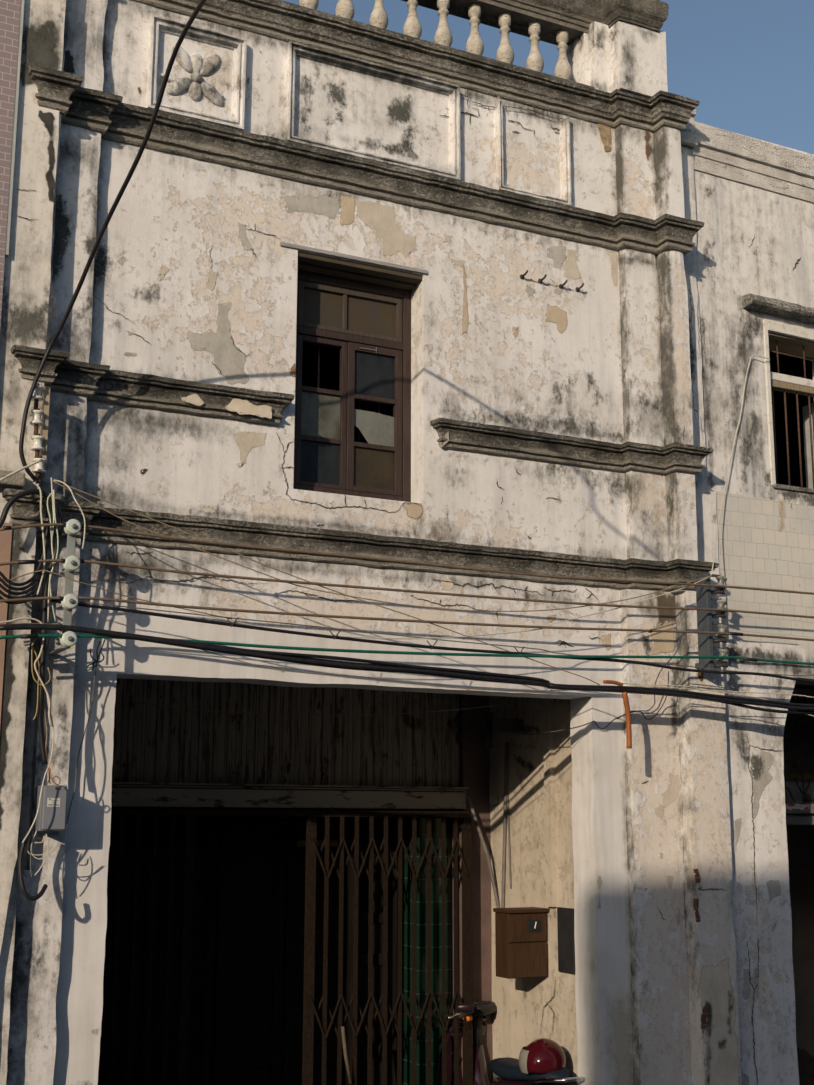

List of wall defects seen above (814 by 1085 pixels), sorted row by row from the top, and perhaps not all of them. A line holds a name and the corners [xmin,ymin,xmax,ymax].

water stain [20,18,75,86]
water stain [327,83,346,125]
mould [359,95,418,158]
water stain [1,110,71,342]
peeling [284,194,416,258]
peeling [186,302,249,384]
peeling [181,394,204,406]
peeling [225,398,272,419]
crack [276,432,421,513]
crack [739,734,780,1084]
mould [10,917,27,1013]
peeling [699,958,751,1085]